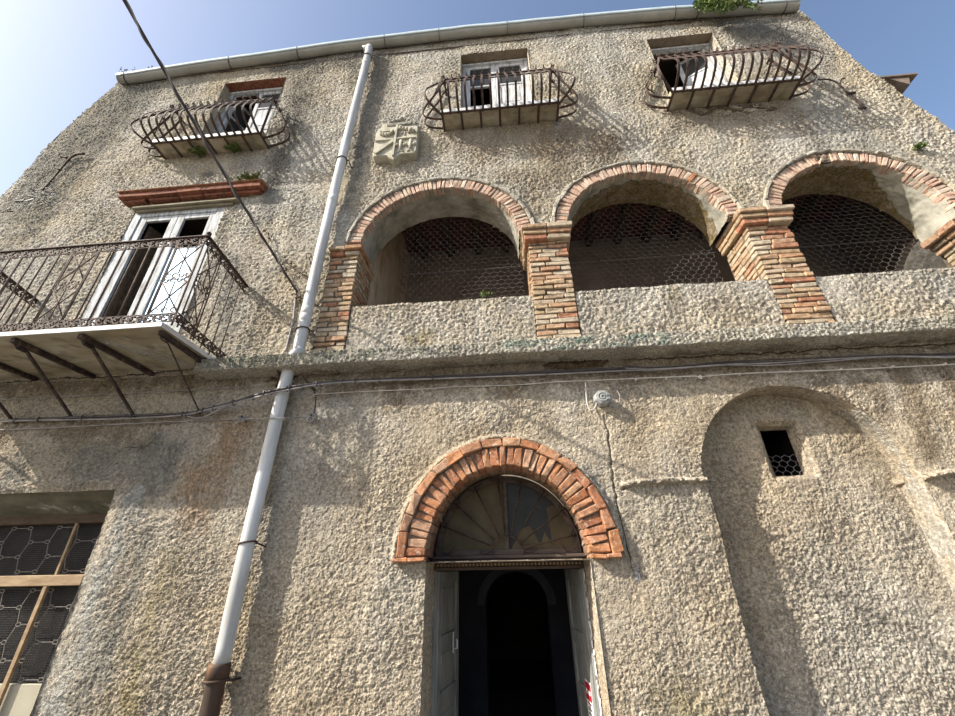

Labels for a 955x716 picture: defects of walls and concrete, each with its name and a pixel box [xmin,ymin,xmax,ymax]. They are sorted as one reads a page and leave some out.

crack [604,418,632,567]